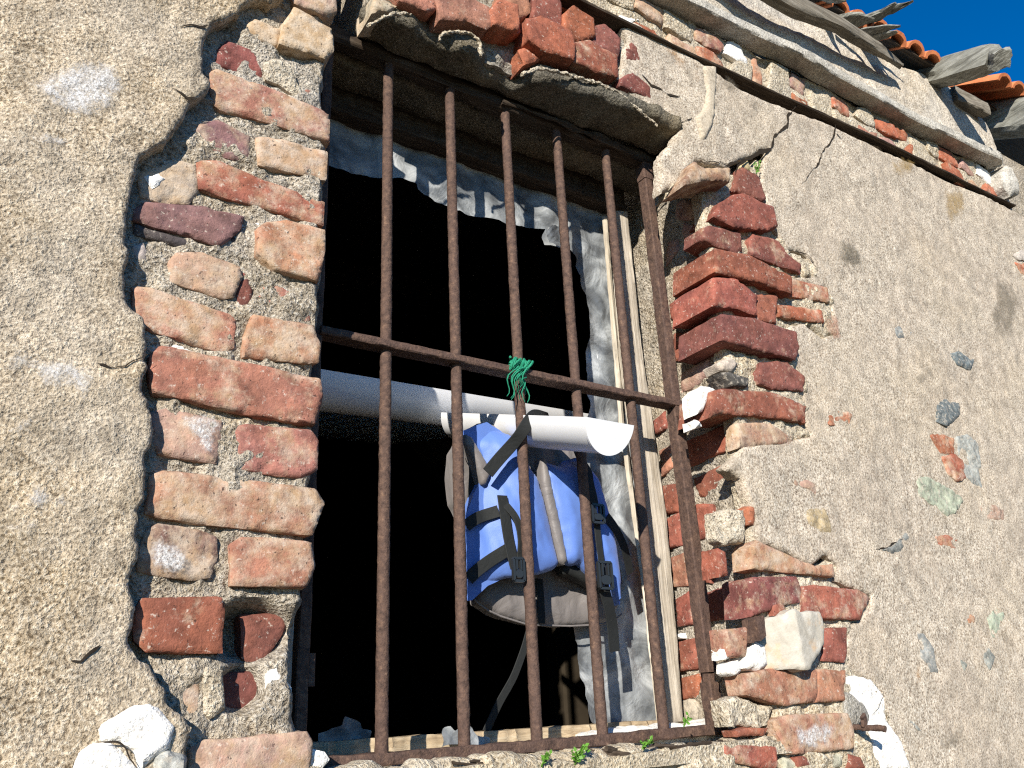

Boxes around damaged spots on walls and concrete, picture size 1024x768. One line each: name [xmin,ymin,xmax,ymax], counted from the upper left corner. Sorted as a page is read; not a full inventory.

spalling [73,0,337,768]
spalling [356,0,658,126]
spalling [653,159,911,768]
crack [802,125,841,183]